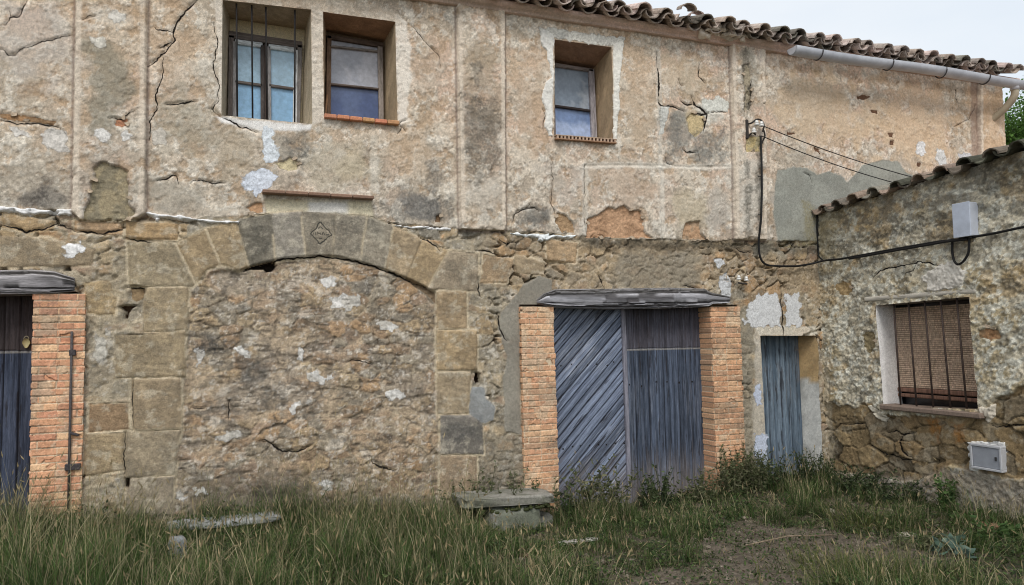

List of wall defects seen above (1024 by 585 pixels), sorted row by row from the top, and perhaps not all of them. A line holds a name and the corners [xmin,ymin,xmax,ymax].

crack [111,0,255,140]
crack [656,56,723,165]
spalling [83,162,135,222]
spalling [554,206,652,240]
spalling [682,221,709,241]
crack [872,261,938,279]